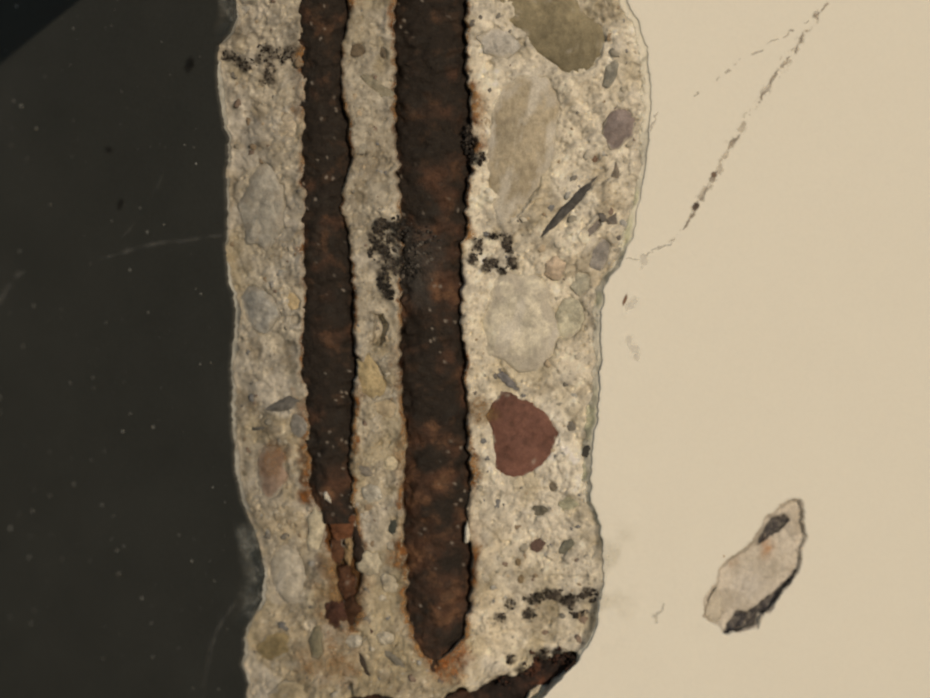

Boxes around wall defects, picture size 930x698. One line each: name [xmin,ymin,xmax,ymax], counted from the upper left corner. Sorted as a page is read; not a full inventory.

crack [752,4,827,100]
crack [626,124,745,260]
rust [367,201,442,328]
spalling [218,0,651,698]
rust [298,415,314,503]
rust [466,399,492,487]
rust [324,475,373,634]
rust [391,537,470,680]
rust [469,545,479,587]
rust [496,646,577,687]
spalling [702,499,807,634]